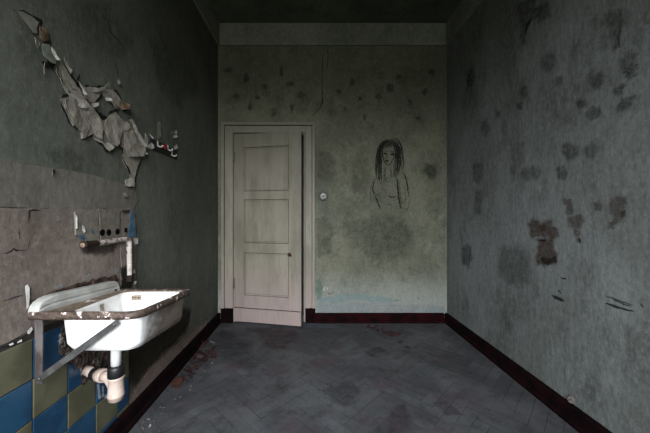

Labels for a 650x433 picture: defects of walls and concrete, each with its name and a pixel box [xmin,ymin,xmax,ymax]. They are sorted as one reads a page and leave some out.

flaking render [0,9,161,350]
water stain [528,218,559,267]